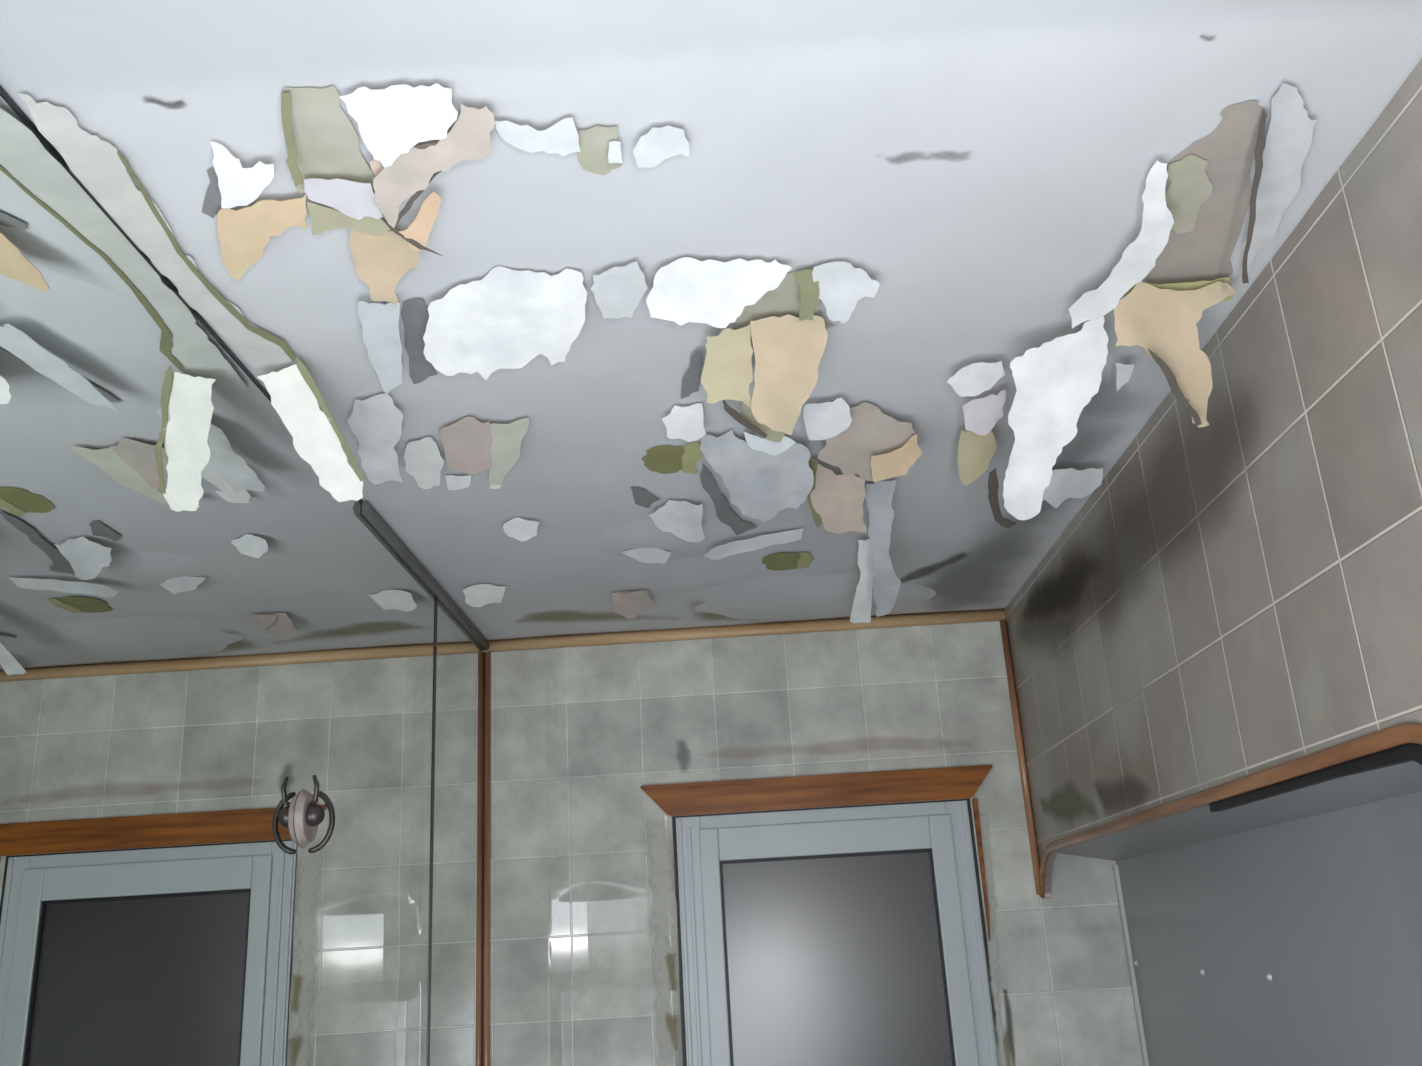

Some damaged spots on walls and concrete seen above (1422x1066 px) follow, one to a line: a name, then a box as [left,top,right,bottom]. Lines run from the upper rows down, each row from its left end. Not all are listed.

peeling [19,83,922,623]
peeling [947,83,1317,529]